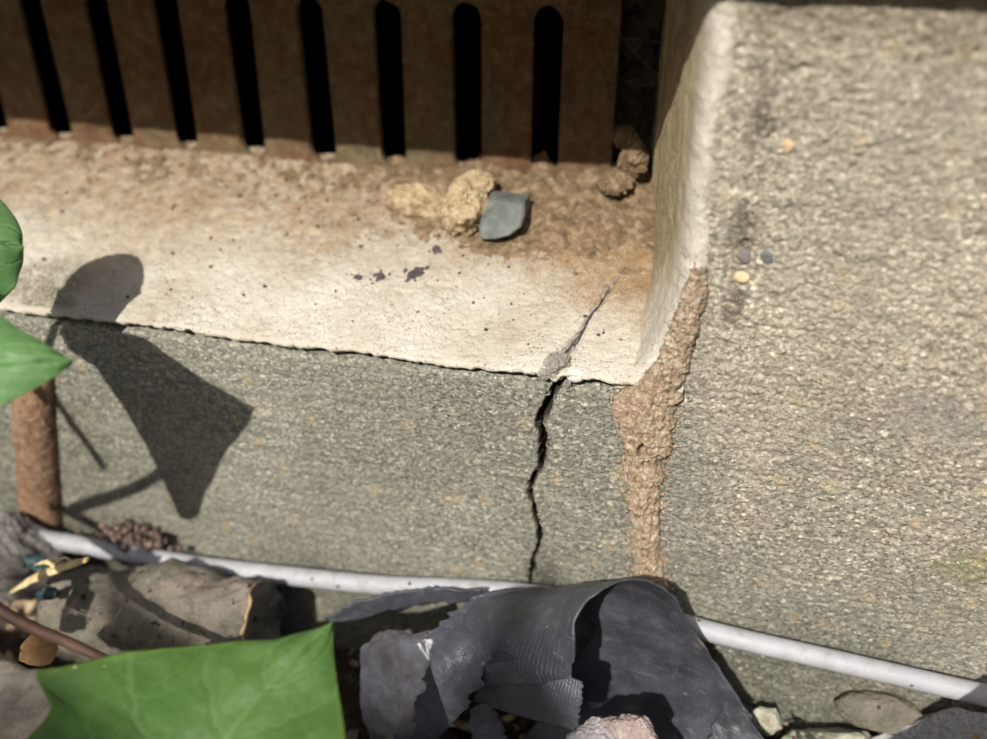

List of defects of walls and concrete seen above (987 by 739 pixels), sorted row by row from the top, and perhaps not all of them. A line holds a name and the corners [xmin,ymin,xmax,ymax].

crack [518,266,625,584]